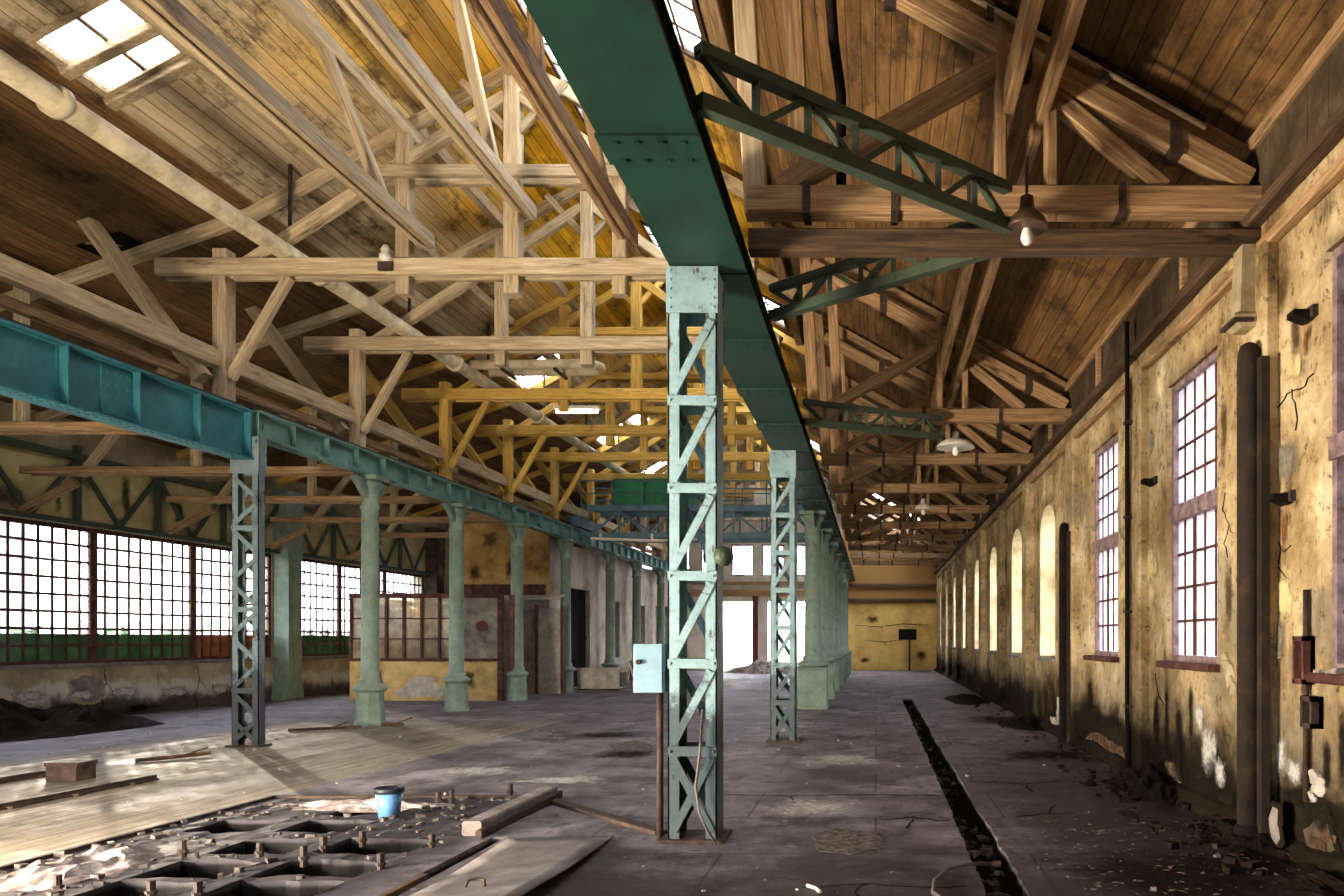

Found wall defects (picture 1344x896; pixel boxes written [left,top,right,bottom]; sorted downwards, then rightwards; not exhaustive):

crack [1278,373,1314,431]
flaking render [395,675,445,699]
damp [1088,680,1121,728]
damp [1004,750,1089,759]
damp [1148,689,1235,807]
damp [1323,709,1344,790]
damp [1277,741,1338,832]